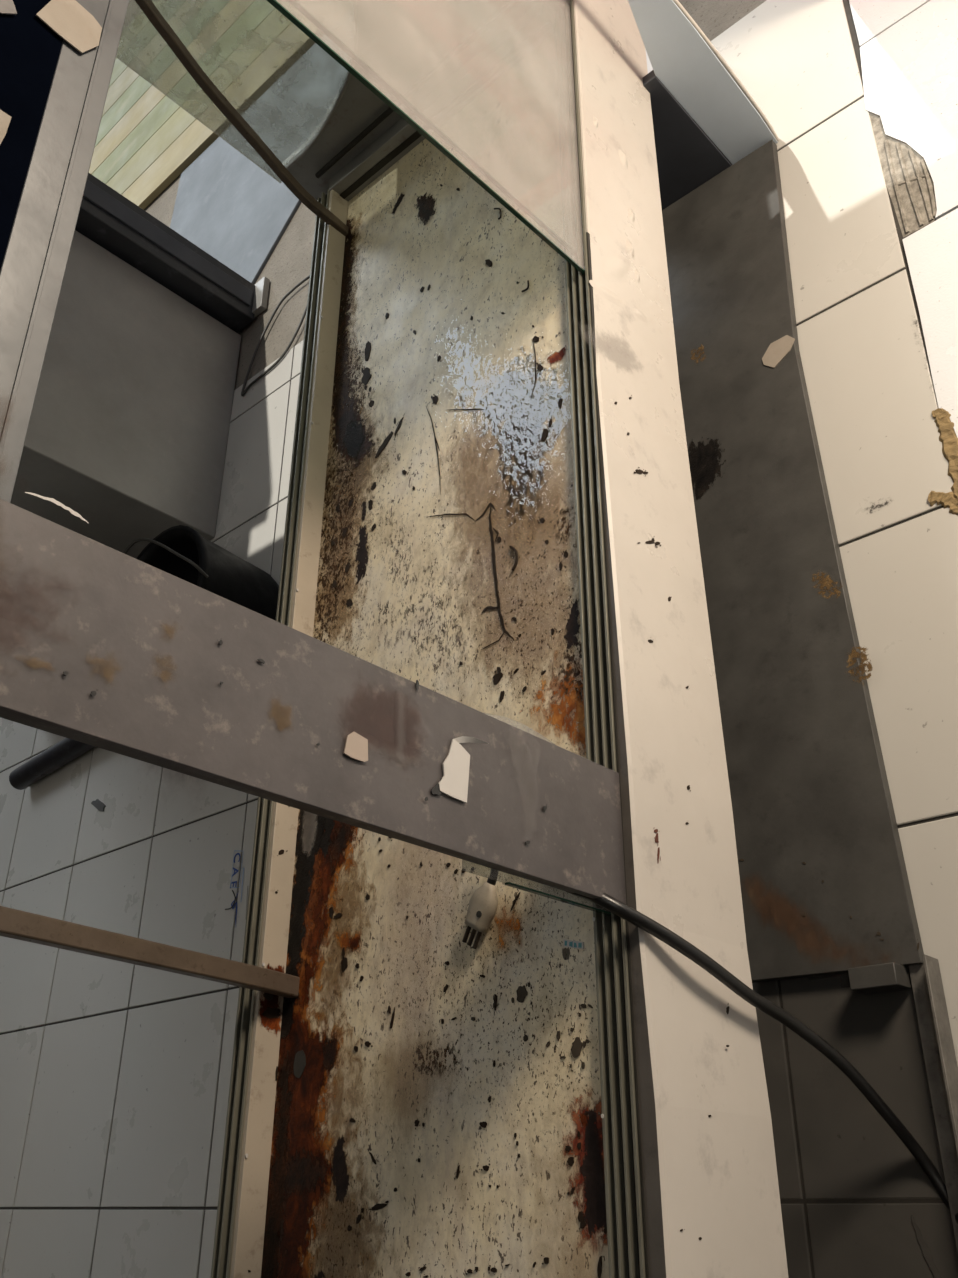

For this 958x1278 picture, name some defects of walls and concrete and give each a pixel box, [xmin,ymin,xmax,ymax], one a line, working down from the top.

crack [426,407,514,650]
rust [520,666,586,755]
rust [260,820,383,1278]